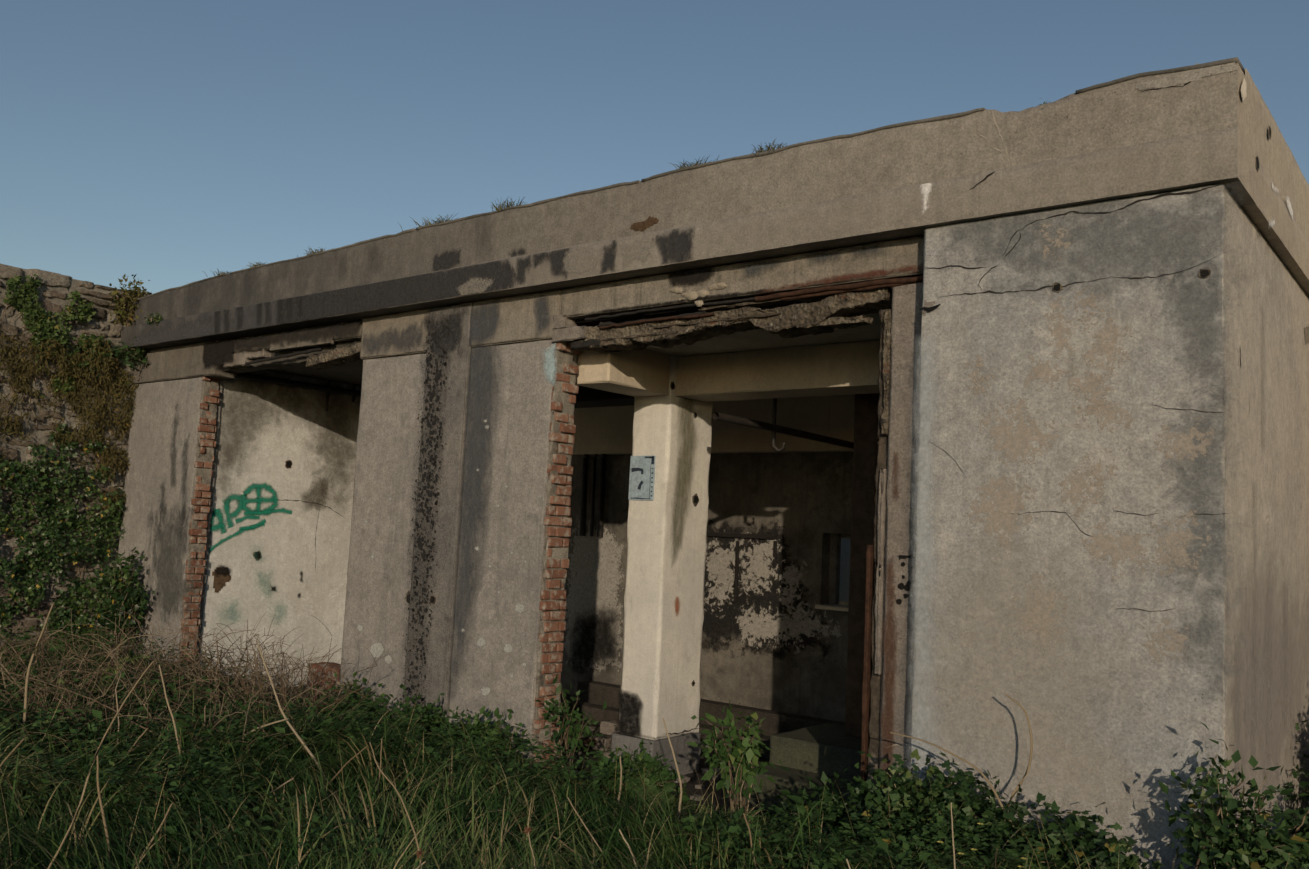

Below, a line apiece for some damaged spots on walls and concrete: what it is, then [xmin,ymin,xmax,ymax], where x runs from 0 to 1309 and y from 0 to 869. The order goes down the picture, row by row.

water stain [433,250,461,271]
spalling [919,300,940,316]
crack [929,183,1226,297]
water stain [149,407,189,616]
flaking render [179,329,361,665]
spalling [532,265,923,804]
crack [995,511,1093,537]
crack [1118,510,1229,518]